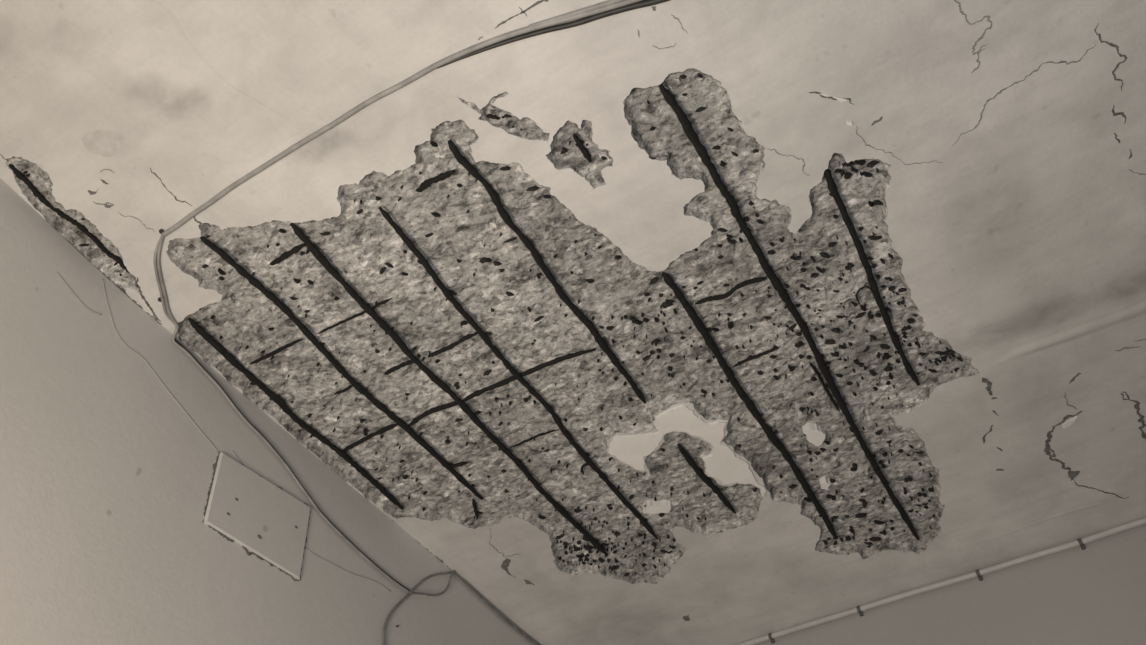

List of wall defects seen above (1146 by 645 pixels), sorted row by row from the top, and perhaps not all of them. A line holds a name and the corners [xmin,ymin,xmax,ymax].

crack [954,0,992,74]
crack [809,23,1146,175]
spalling [6,156,143,299]
spalling [166,68,980,586]
crack [1044,373,1129,499]
crack [1121,391,1146,440]